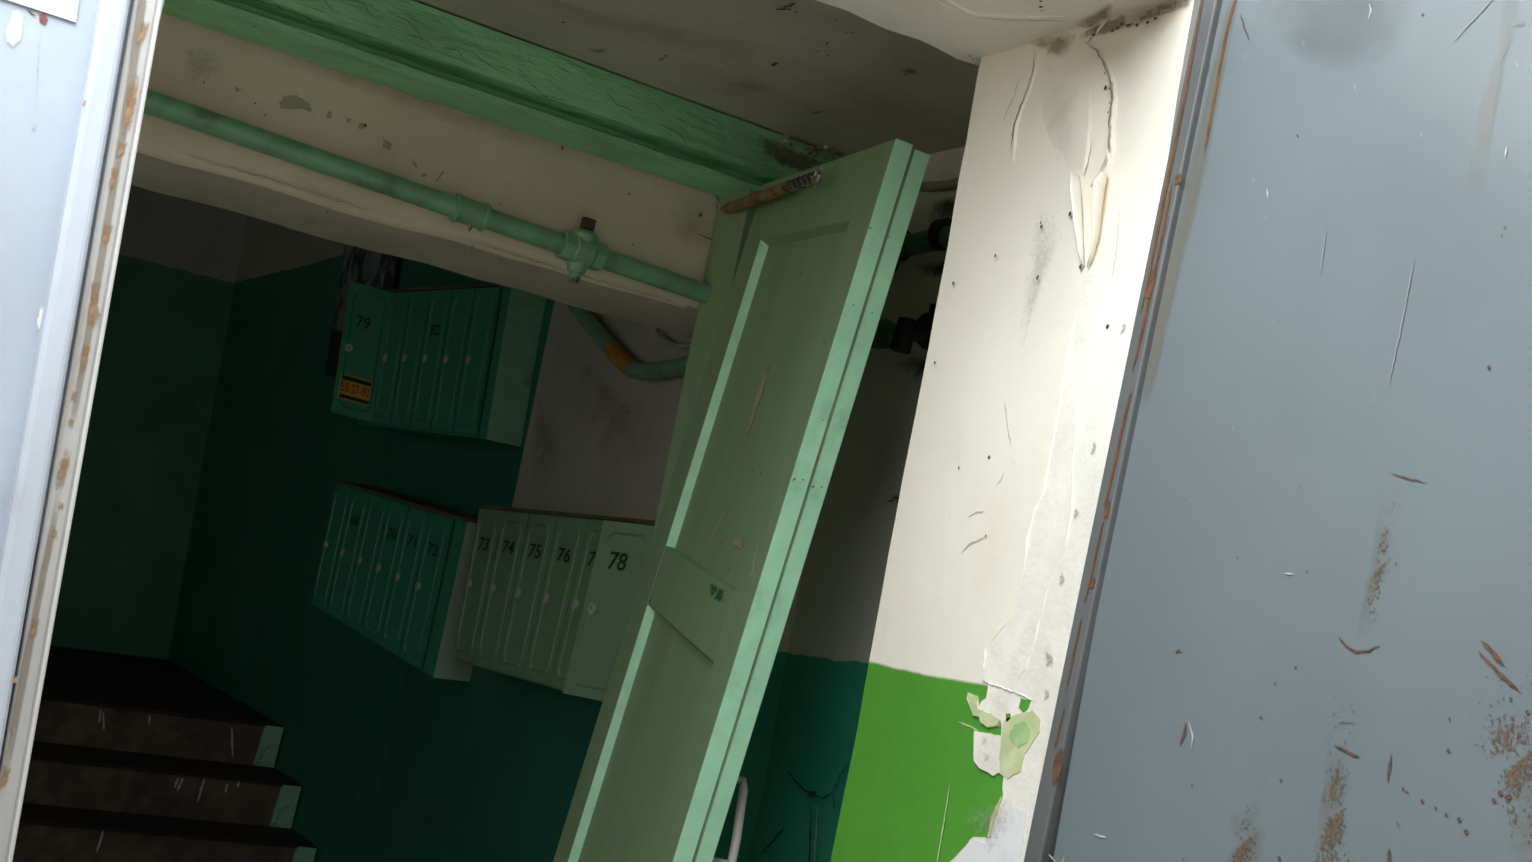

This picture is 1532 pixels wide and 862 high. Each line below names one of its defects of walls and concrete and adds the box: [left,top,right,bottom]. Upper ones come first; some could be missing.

corrosion [62,0,149,429]
peeling [264,95,364,129]
corrosion [1132,0,1236,368]
corrosion [9,528,57,742]
corrosion [57,458,69,509]
flaking render [950,145,1143,862]
corrosion [1084,393,1132,601]
corrosion [1365,528,1394,633]
corrosion [1052,710,1065,784]
corrosion [1228,806,1261,862]
corrosion [1314,696,1354,862]
corrosion [1474,680,1532,862]